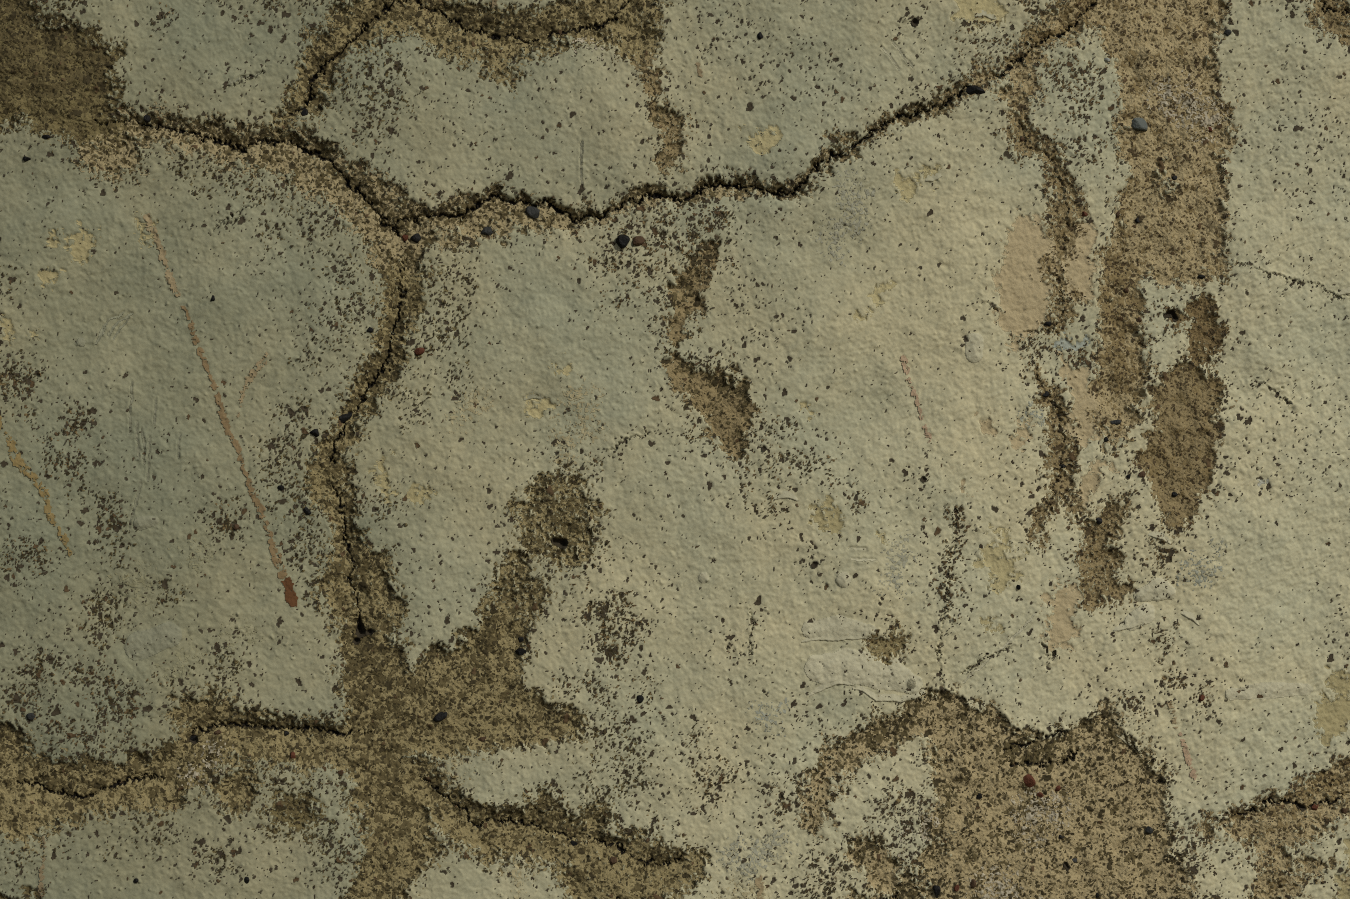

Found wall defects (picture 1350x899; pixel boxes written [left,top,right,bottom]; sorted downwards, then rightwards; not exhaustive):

crack [1322,3,1350,15]
crack [100,0,1098,634]
peeling [368,451,438,522]
crack [194,721,366,737]
crack [18,773,164,799]
peeling [666,721,746,821]
spalling [758,666,1350,899]